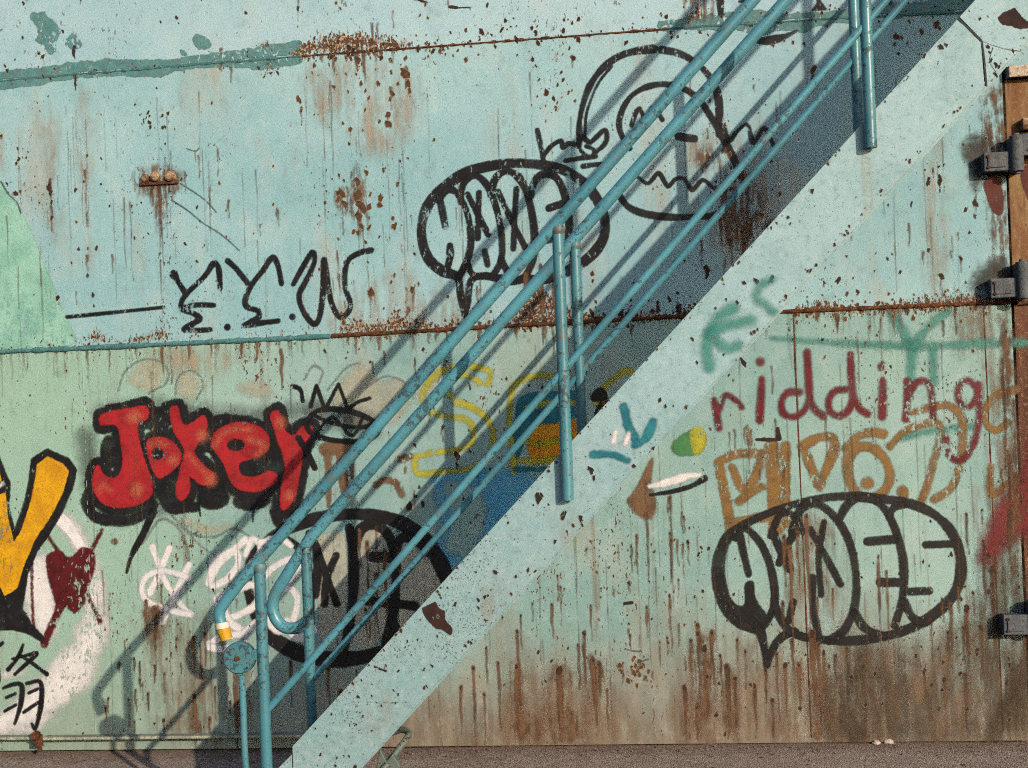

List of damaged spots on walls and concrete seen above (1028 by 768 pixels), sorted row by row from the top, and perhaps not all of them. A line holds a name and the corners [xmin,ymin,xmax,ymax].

peeling [0,11,303,90]
corrosion [289,11,576,145]
corrosion [558,16,607,62]
peeling [978,8,1028,29]
corrosion [113,142,200,262]
corrosion [311,165,427,294]
corrosion [683,129,783,285]
corrosion [1,326,218,382]
corrosion [238,263,700,389]
corrosion [99,578,249,748]
corrosion [459,582,667,741]
corrosion [613,495,878,739]